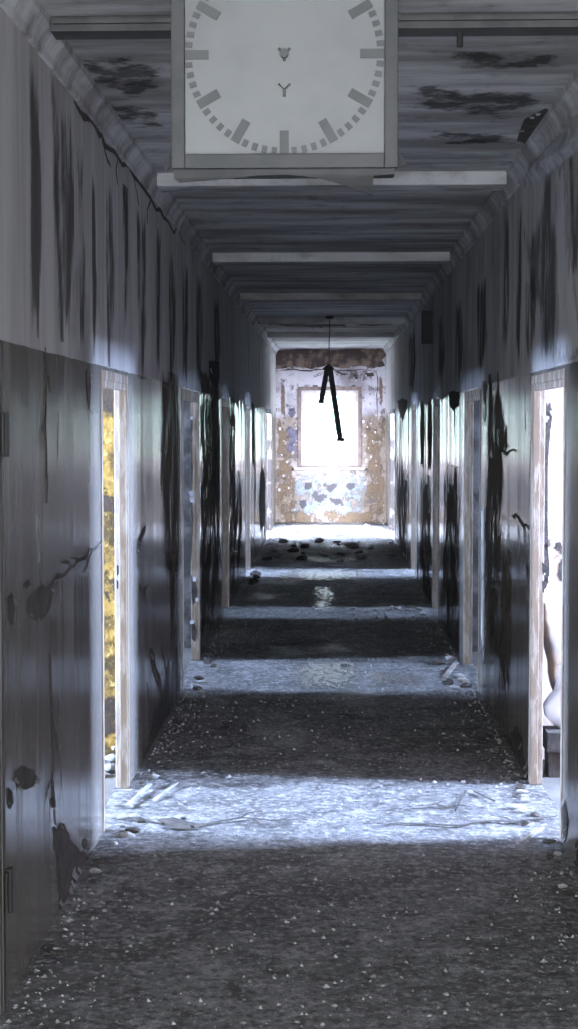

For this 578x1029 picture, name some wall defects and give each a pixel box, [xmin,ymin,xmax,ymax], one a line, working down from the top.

water stain [30,78,41,333]
water stain [54,128,220,752]
peeling [252,403,266,531]
peeling [278,407,367,515]
water stain [478,280,511,716]